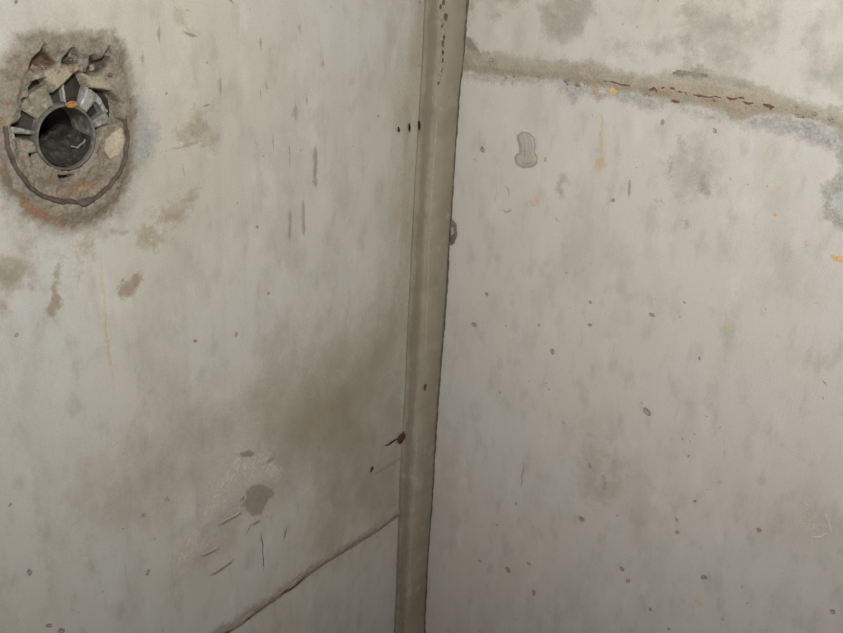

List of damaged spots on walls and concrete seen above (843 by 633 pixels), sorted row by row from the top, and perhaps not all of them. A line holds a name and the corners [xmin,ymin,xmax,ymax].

spalling [0,27,142,235]
water stain [465,37,843,164]
water stain [256,308,405,535]